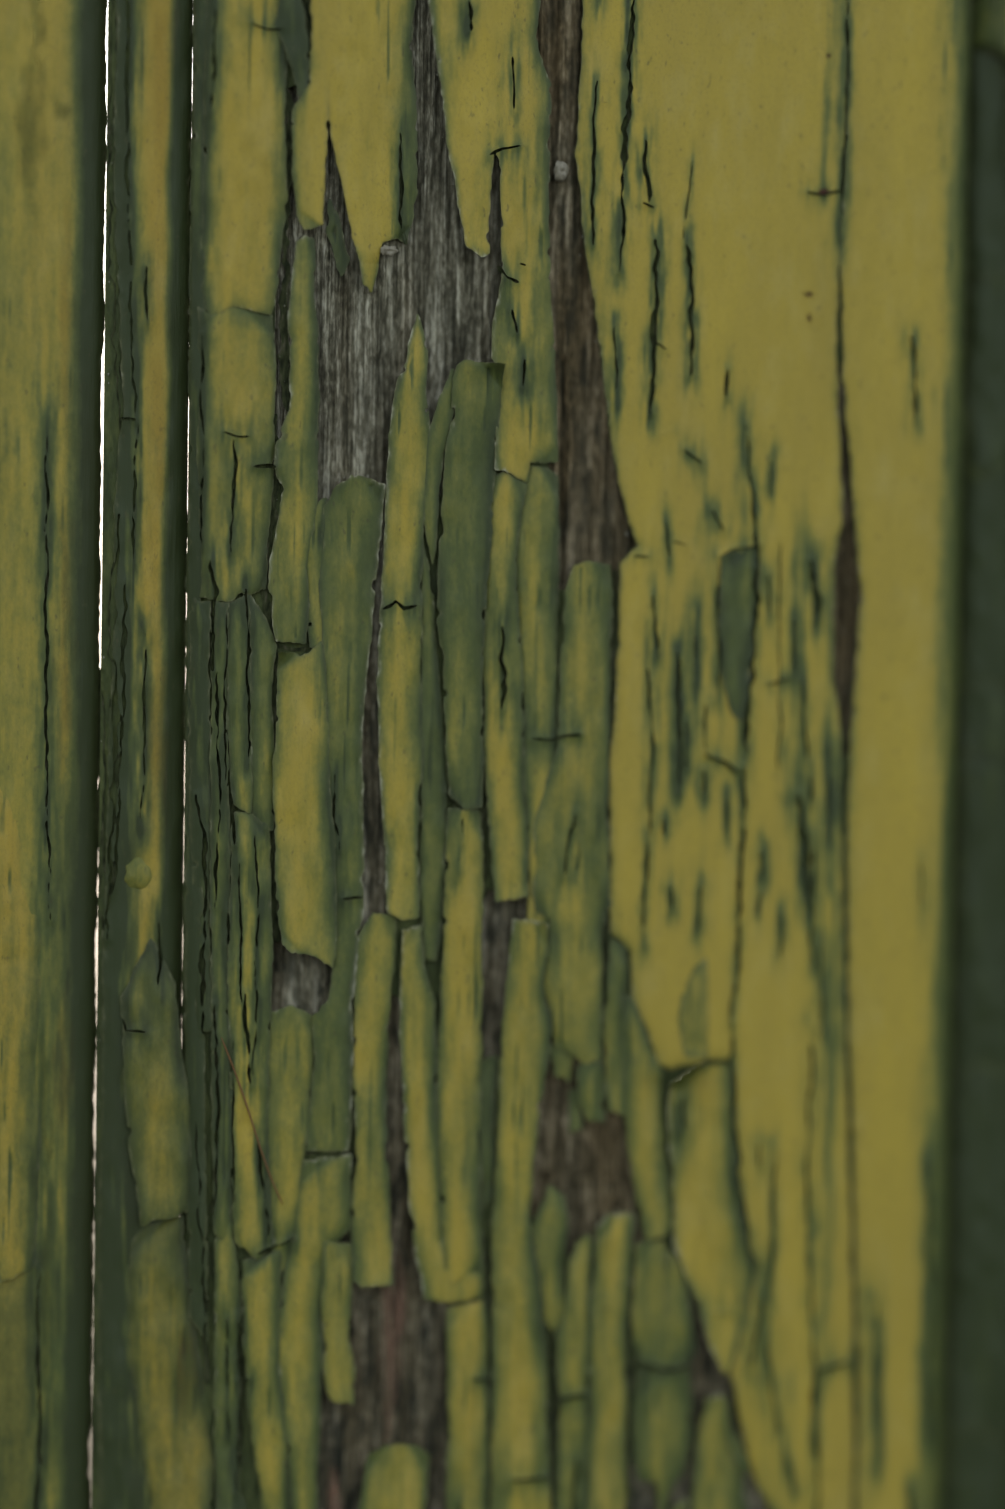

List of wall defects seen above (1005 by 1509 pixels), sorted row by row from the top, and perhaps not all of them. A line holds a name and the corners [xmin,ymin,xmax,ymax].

crack [590,0,728,463]
crack [807,7,848,211]
peeling [0,790,42,1282]
peeling [98,0,769,1509]
crack [433,1002,441,1086]
crack [446,611,507,900]
crack [533,442,878,1509]
crack [459,1233,588,1509]